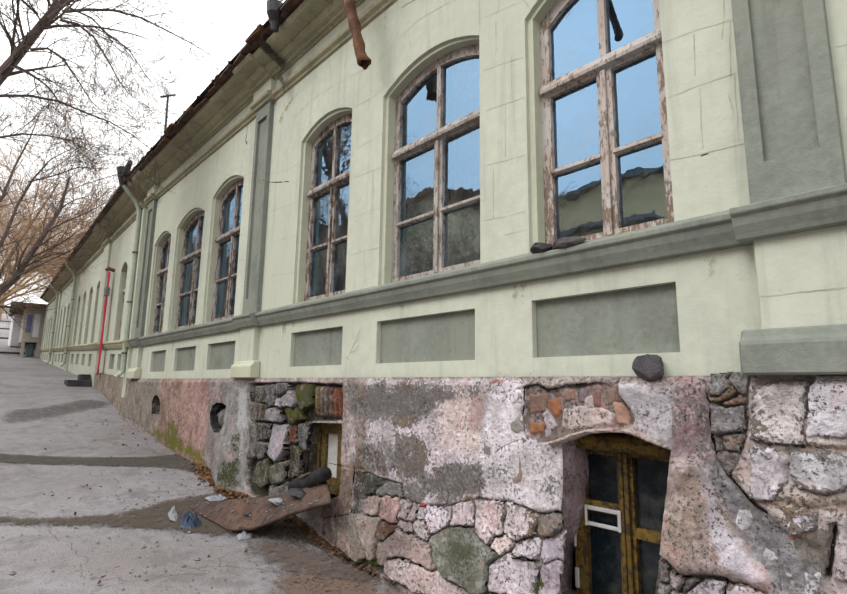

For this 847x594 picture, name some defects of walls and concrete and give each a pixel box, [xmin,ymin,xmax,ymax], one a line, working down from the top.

spalling [247,383,343,497]
spalling [510,383,635,442]
spalling [708,372,751,475]
spalling [322,471,567,594]
peeling [736,509,754,530]
peeling [763,548,779,562]
peeling [804,571,821,594]